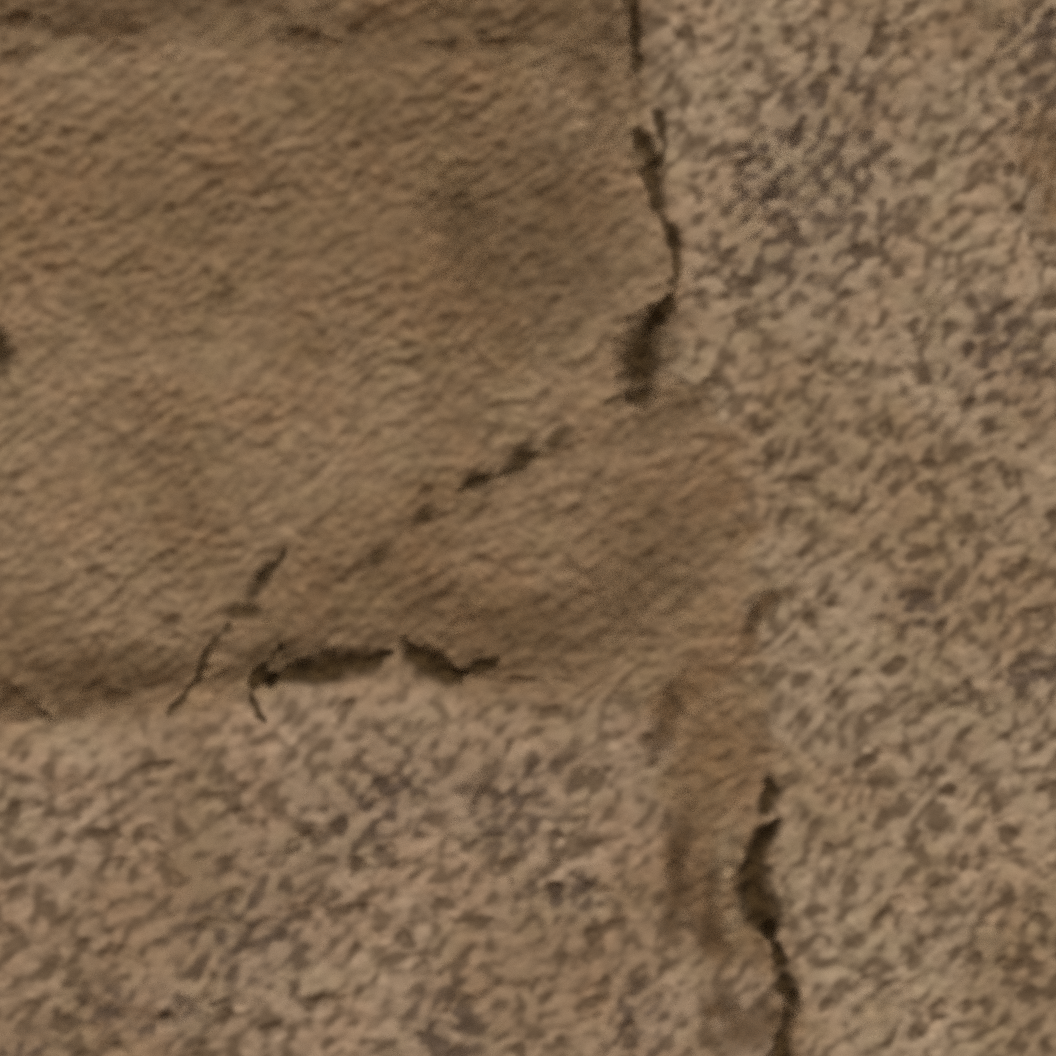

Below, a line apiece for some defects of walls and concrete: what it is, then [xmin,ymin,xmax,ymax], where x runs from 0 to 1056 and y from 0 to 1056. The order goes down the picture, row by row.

crack [626,0,642,72]
crack [634,110,680,322]
crack [458,428,567,492]
crack [416,509,430,521]
crack [249,640,499,722]
crack [737,778,797,1056]